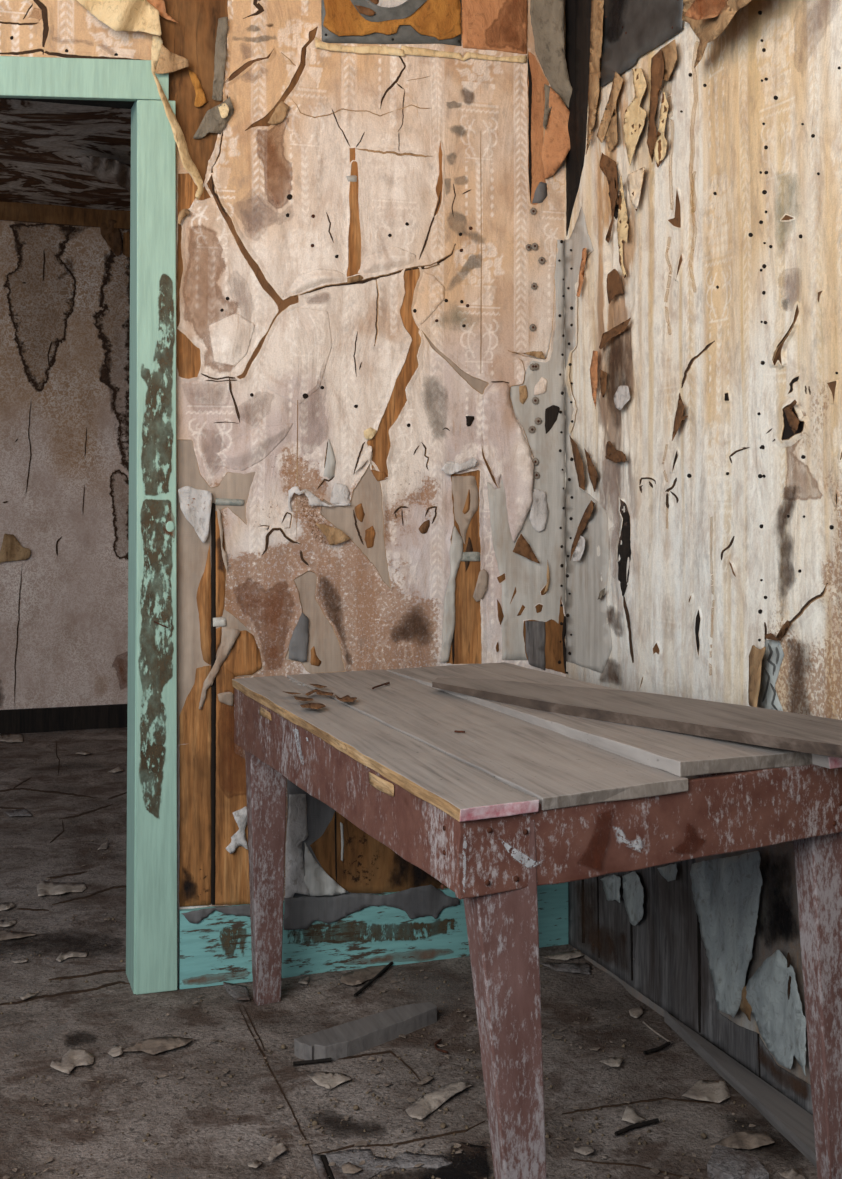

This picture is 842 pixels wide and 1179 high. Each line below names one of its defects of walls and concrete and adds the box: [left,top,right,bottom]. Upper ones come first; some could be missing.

crack [243,0,268,21]
crack [292,46,430,151]
peeling [599,68,669,304]
crack [201,85,470,566]
peeling [590,351,630,410]
peeling [138,274,212,818]
peeling [482,382,540,563]
peeling [569,435,598,561]
peeling [748,645,766,707]
peeling [288,919,456,959]
crack [238,1005,485,1157]
peeling [707,1131,807,1179]